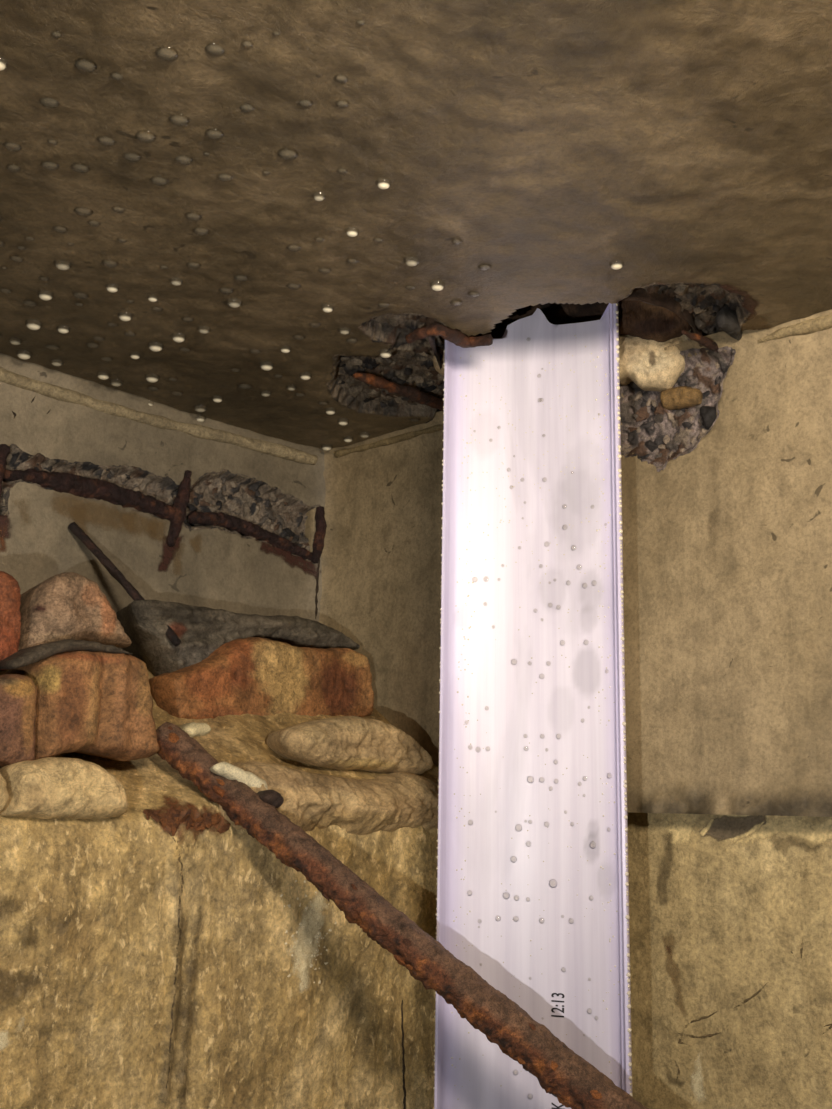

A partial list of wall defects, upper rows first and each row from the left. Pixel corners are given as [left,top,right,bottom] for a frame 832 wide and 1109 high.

corrosion [718,284,771,331]
spalling [326,313,493,424]
spalling [616,282,763,472]
spalling [0,444,327,568]
corrosion [0,514,10,551]
corrosion [158,537,199,571]
corrosion [260,542,318,577]
corrosion [143,796,230,838]
crack [677,983,767,1078]